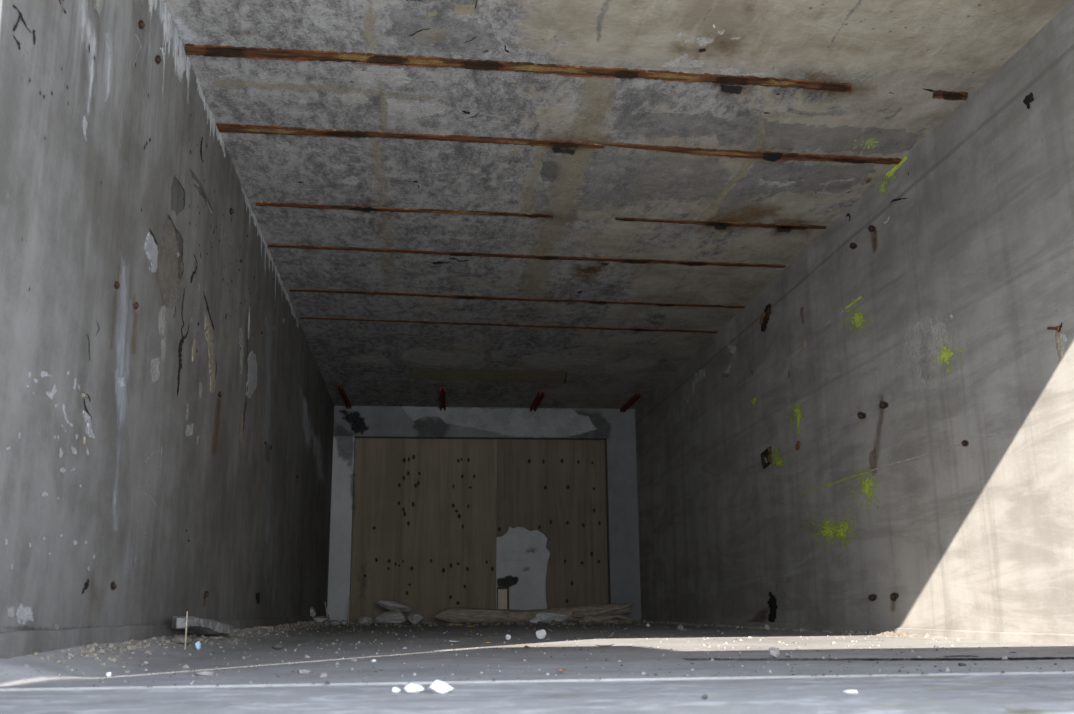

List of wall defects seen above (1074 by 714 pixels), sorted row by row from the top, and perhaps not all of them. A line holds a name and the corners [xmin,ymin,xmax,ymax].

crack [13,5,38,54]
efflorescence [81,0,111,141]
efflorescence [148,0,226,157]
corrosion [352,56,436,68]
corrosion [461,62,501,71]
corrosion [557,70,637,79]
corrosion [716,77,748,94]
corrosion [707,153,790,162]
damp [115,267,129,428]
spalling [144,213,190,385]
crack [174,252,227,395]
peeling [8,603,34,625]